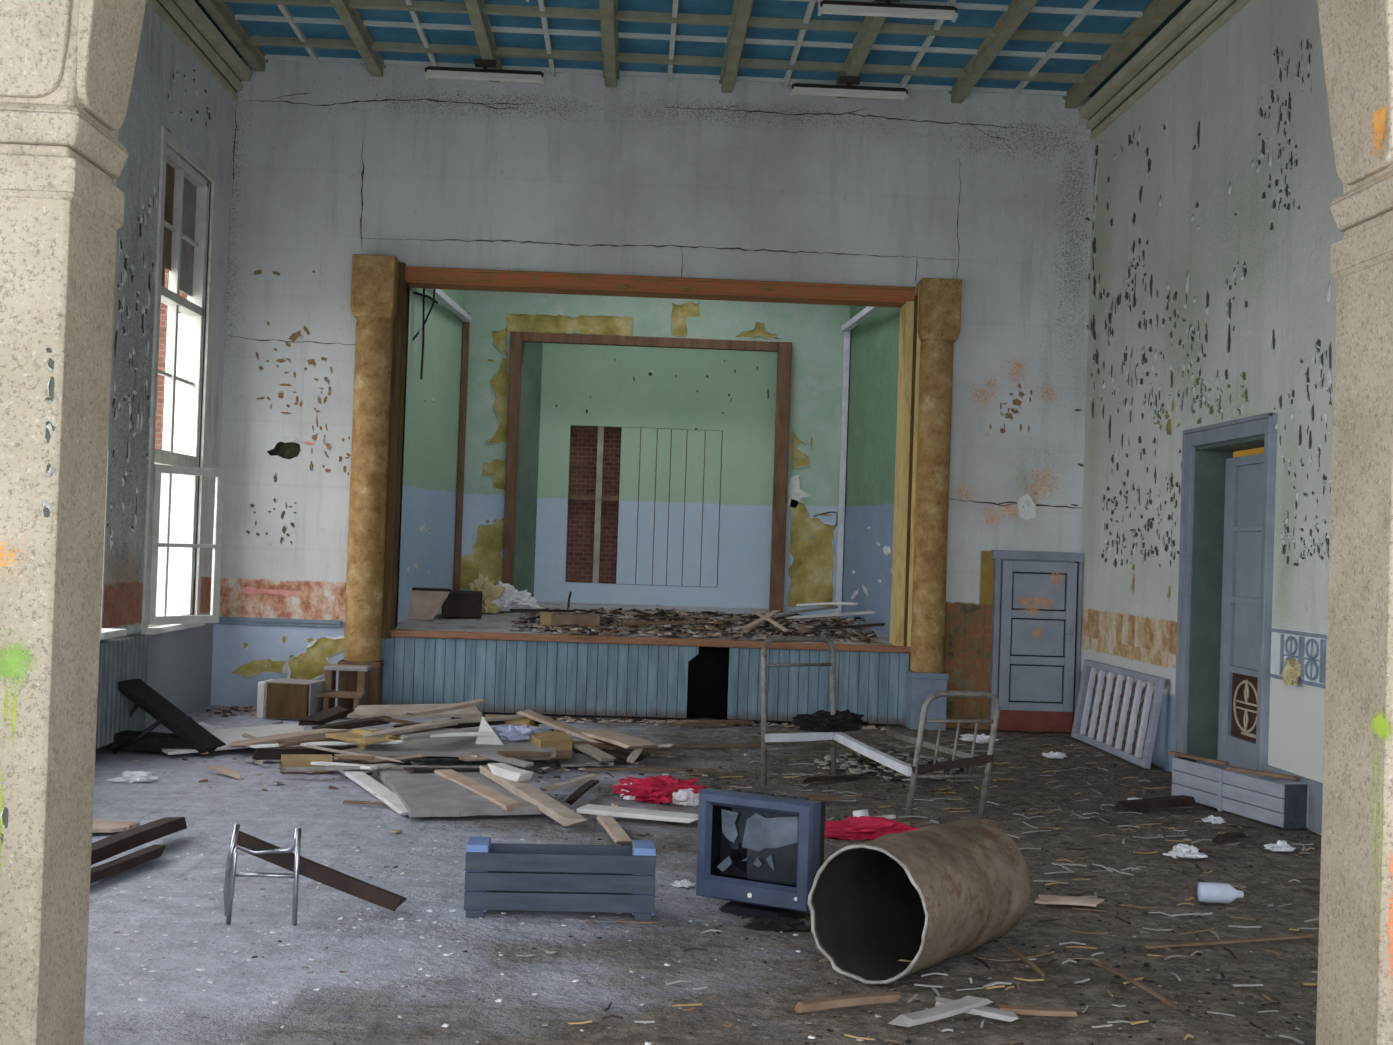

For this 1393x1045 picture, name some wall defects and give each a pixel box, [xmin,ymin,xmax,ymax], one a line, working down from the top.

crack [360,144,961,280]
crack [664,104,1023,141]
peeling [1251,37,1312,232]
peeling [107,186,158,550]
peeling [246,325,351,545]
peeling [482,313,634,490]
peeling [671,301,700,337]
peeling [735,322,781,339]
peeling [1074,125,1250,596]
peeling [1273,339,1332,569]
peeling [460,518,504,591]
peeling [231,634,344,680]